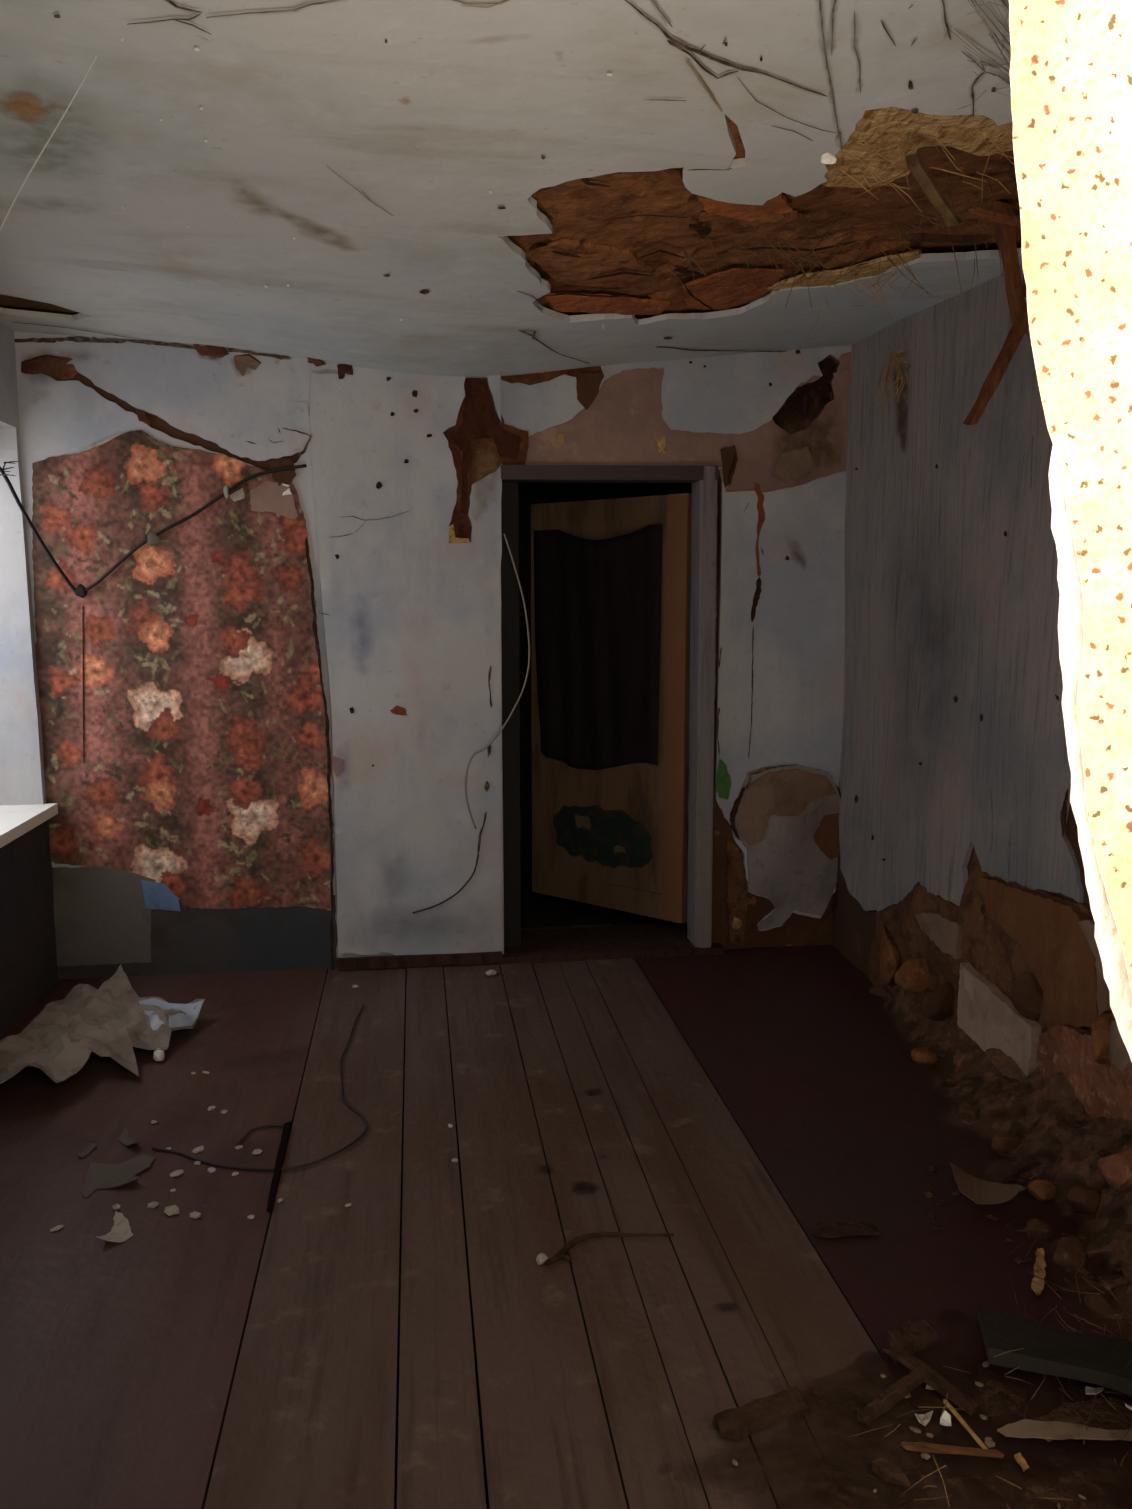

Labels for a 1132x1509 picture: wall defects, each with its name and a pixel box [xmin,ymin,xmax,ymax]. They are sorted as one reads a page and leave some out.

crack [127,0,339,34]
crack [454,0,509,8]
crack [625,0,1010,151]
spalling [507,79,1022,354]
flaking render [21,355,73,374]
flaking render [193,344,261,376]
flaking render [427,352,858,543]
peeling [1060,789,1068,835]
spalling [711,759,834,949]